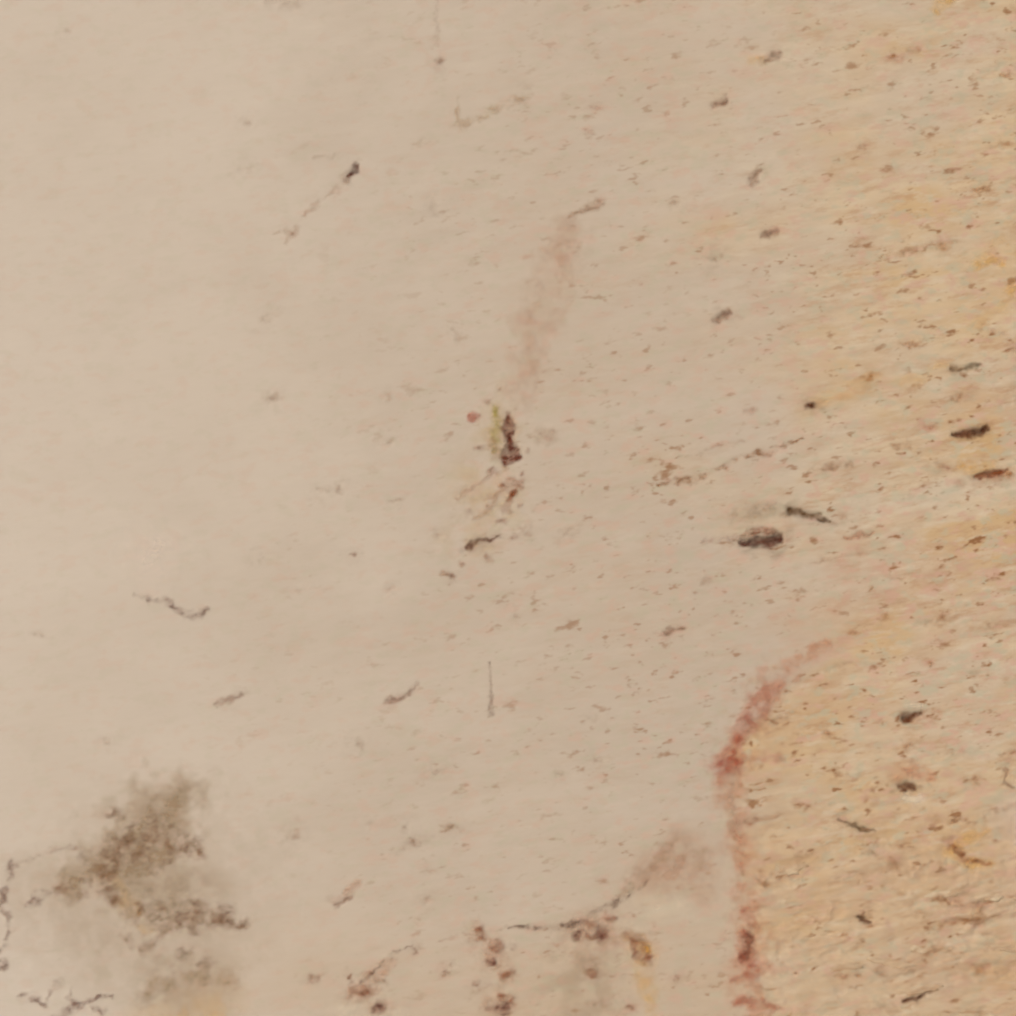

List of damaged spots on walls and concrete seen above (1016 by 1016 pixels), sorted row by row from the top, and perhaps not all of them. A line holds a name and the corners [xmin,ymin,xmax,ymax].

damp [68,789,182,898]